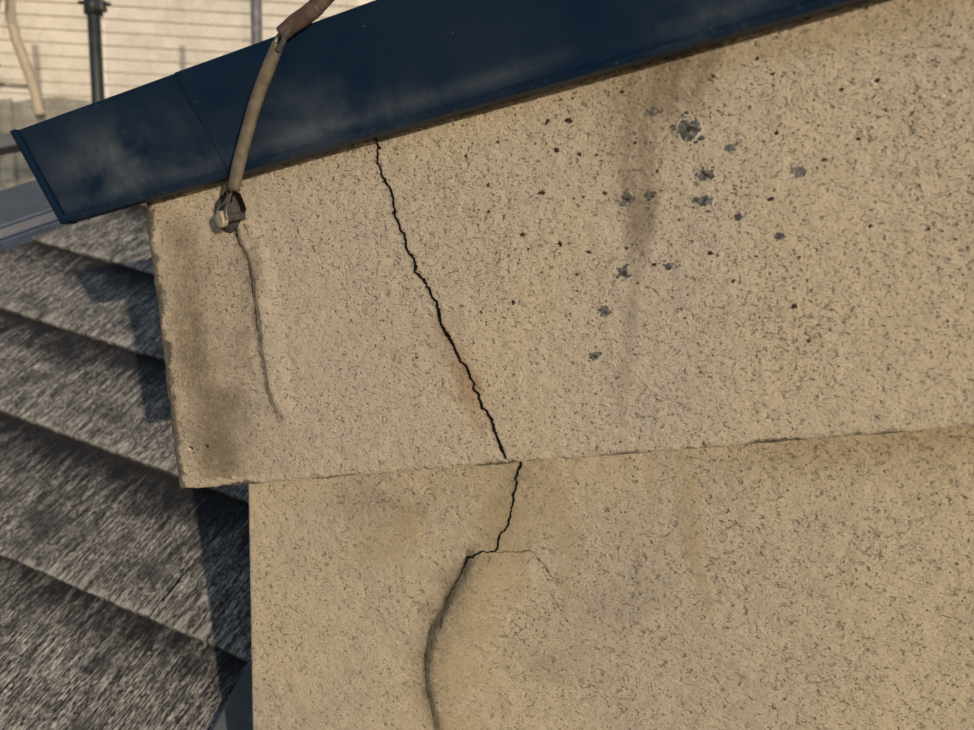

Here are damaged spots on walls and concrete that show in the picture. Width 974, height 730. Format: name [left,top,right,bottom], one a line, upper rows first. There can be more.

crack [235,224,276,413]
crack [375,138,554,715]